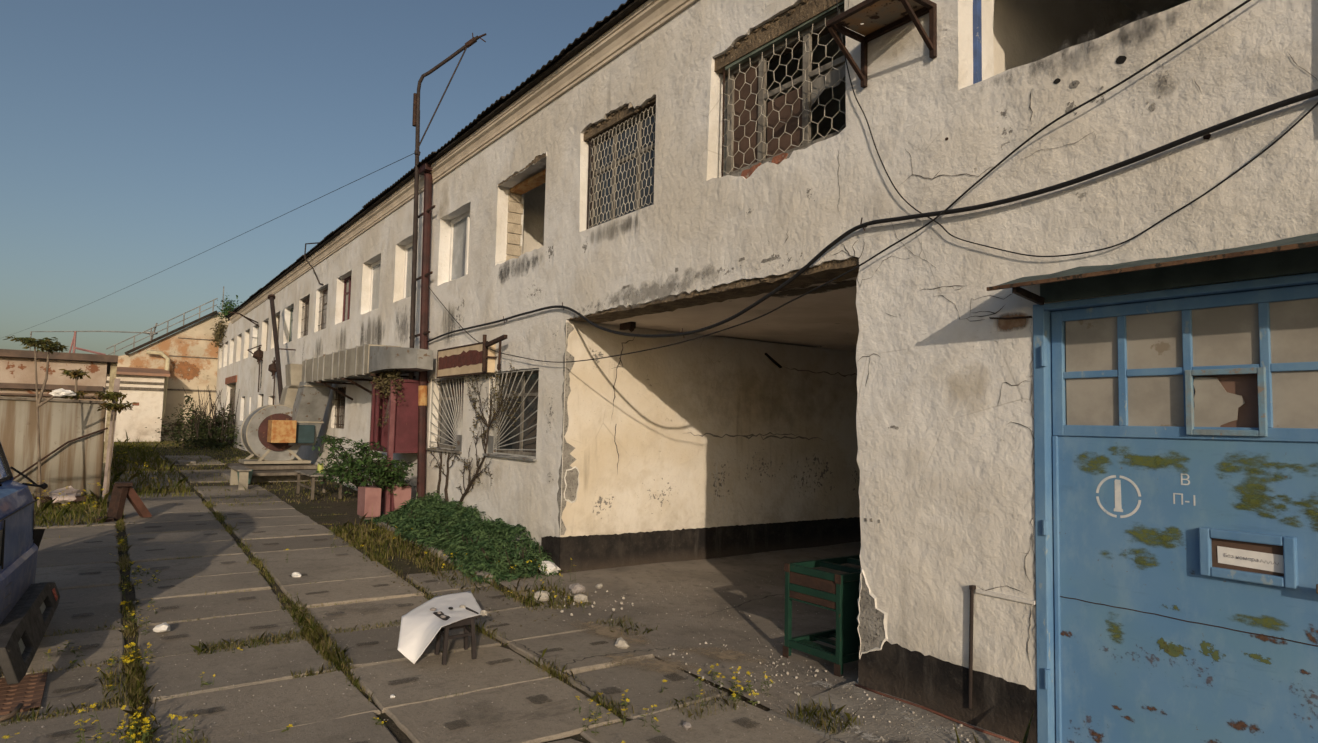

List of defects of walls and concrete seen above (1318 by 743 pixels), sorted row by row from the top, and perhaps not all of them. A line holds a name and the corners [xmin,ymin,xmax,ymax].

water stain [598,269,712,306]
rust [987,241,1318,291]
crack [612,337,635,475]
spalling [544,253,859,535]
crack [689,432,827,441]
spalling [857,569,888,658]
rust [1251,634,1287,644]
rust [1227,720,1260,733]